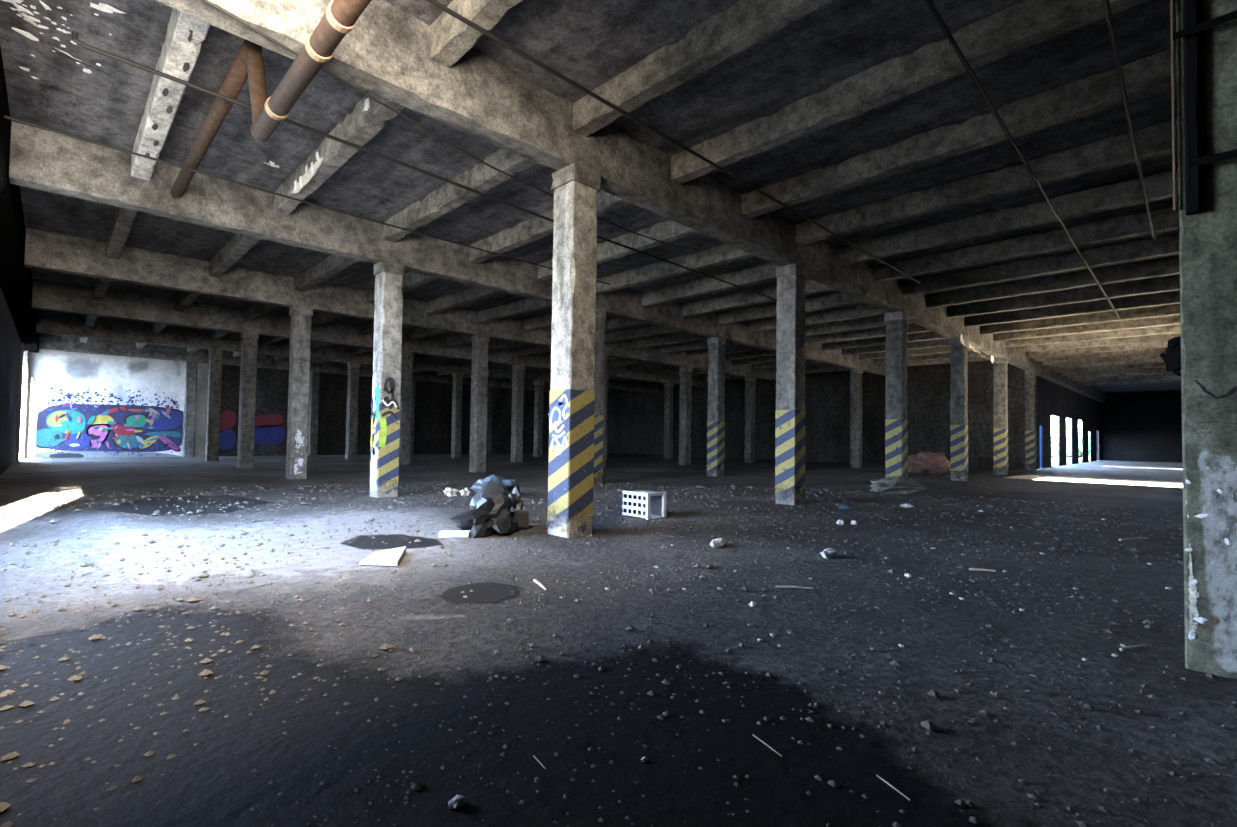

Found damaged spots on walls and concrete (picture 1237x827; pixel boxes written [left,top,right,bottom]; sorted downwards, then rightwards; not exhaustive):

peeling [2,0,77,79]
peeling [90,2,124,16]
peeling [1185,448,1237,672]